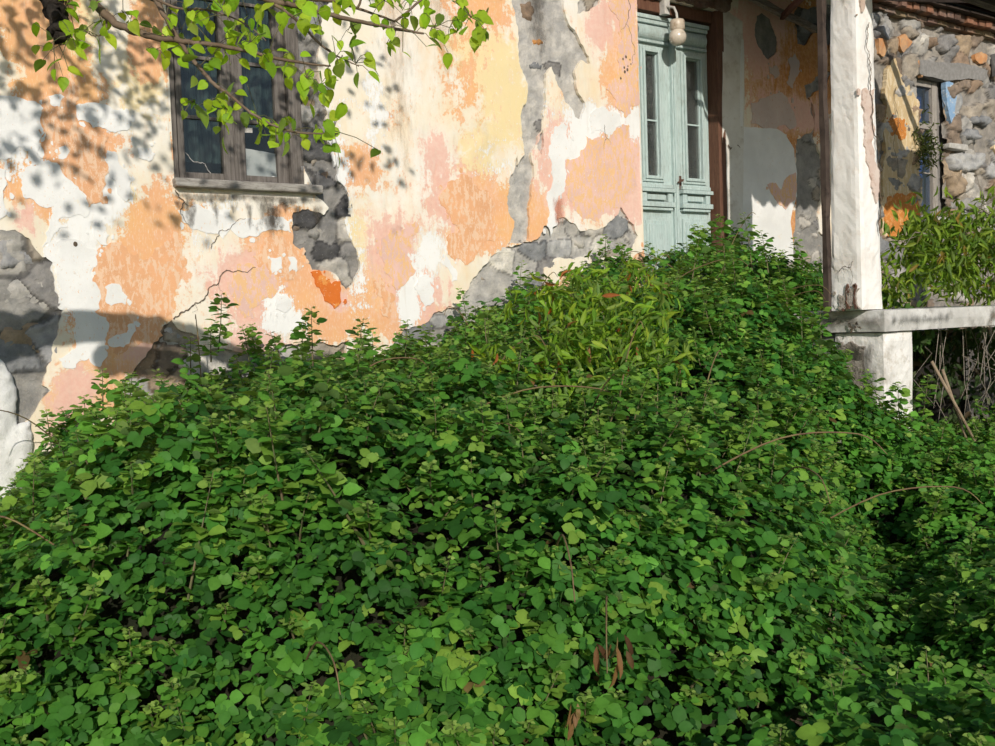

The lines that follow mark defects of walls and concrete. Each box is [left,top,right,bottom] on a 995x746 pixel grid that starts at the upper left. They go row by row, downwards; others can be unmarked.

spalling [0,1,359,424]
crack [173,267,256,319]
damp [200,196,277,230]
spalling [373,0,644,350]
peeling [743,4,831,275]
peeling [856,88,880,204]